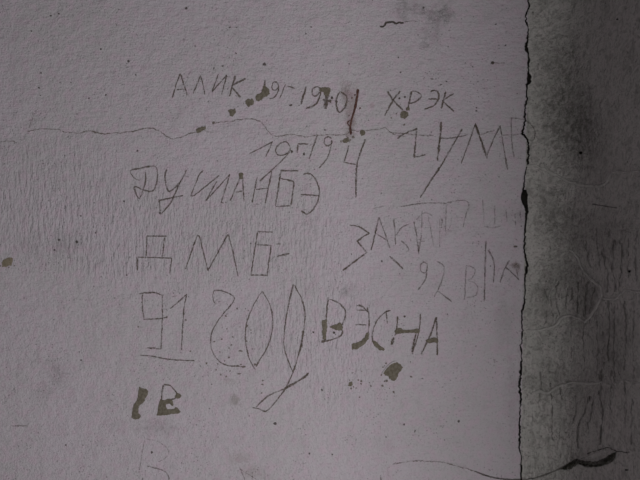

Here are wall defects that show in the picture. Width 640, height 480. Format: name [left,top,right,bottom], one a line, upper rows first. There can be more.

crack [397,0,532,480]